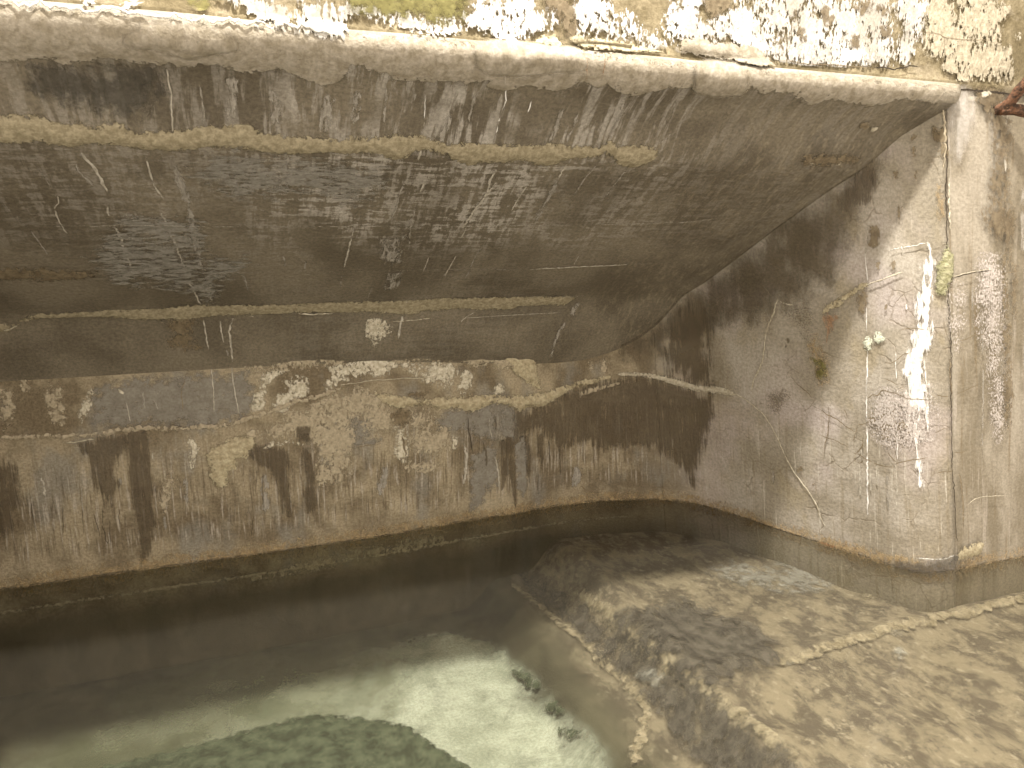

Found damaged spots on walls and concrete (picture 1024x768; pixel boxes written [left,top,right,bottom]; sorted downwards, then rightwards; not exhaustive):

peeling [0,0,1021,107]
peeling [247,386,458,488]
damp [0,152,1024,615]
crack [822,110,951,314]
crack [793,269,1018,541]
rust [975,86,1019,428]